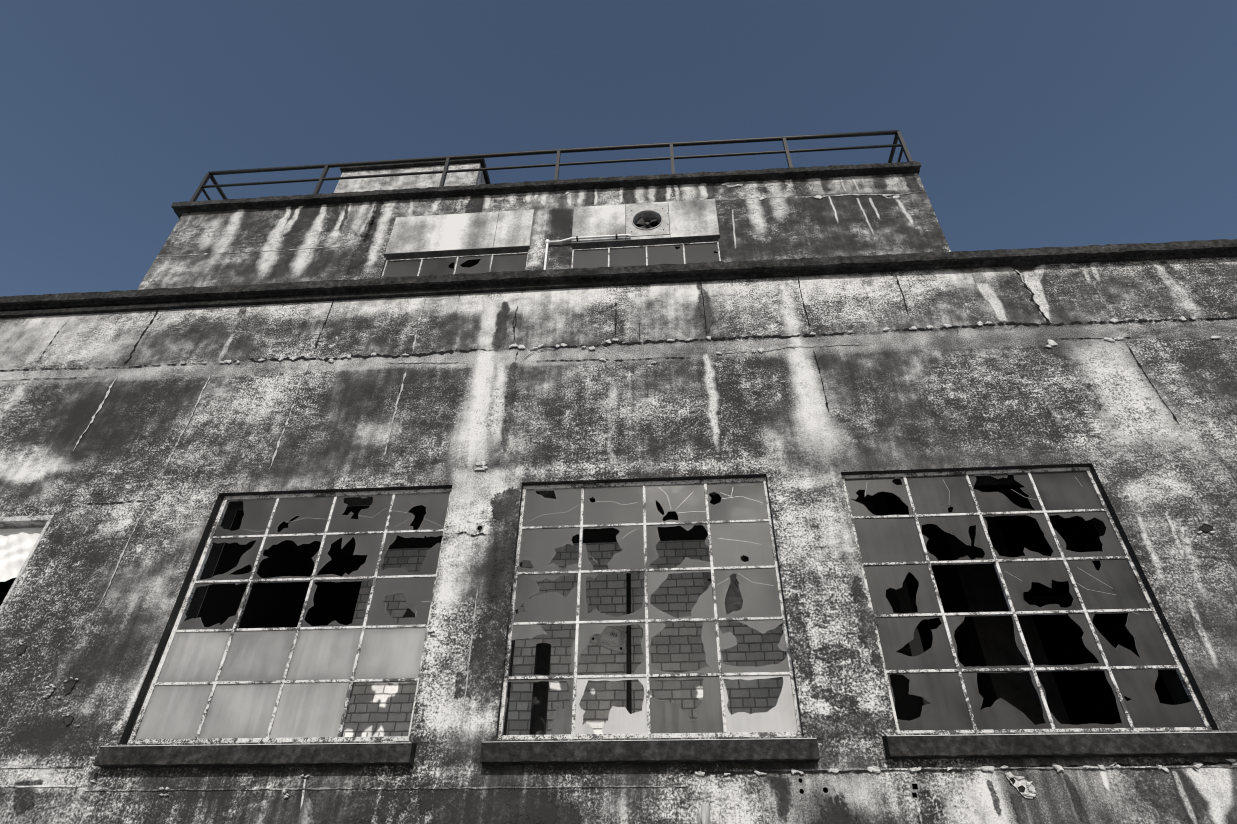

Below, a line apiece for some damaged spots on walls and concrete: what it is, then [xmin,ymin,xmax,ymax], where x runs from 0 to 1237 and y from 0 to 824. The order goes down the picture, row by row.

leakage [198,209,244,259]
leakage [257,199,414,278]
leakage [619,183,715,204]
leakage [732,175,887,248]
leakage [450,296,517,469]
crack [0,271,1237,470]
leakage [703,354,720,449]
crack [59,492,153,645]
leakage [454,486,521,704]
leakage [307,783,583,824]
leakage [917,780,1029,824]
leakage [1135,764,1207,824]